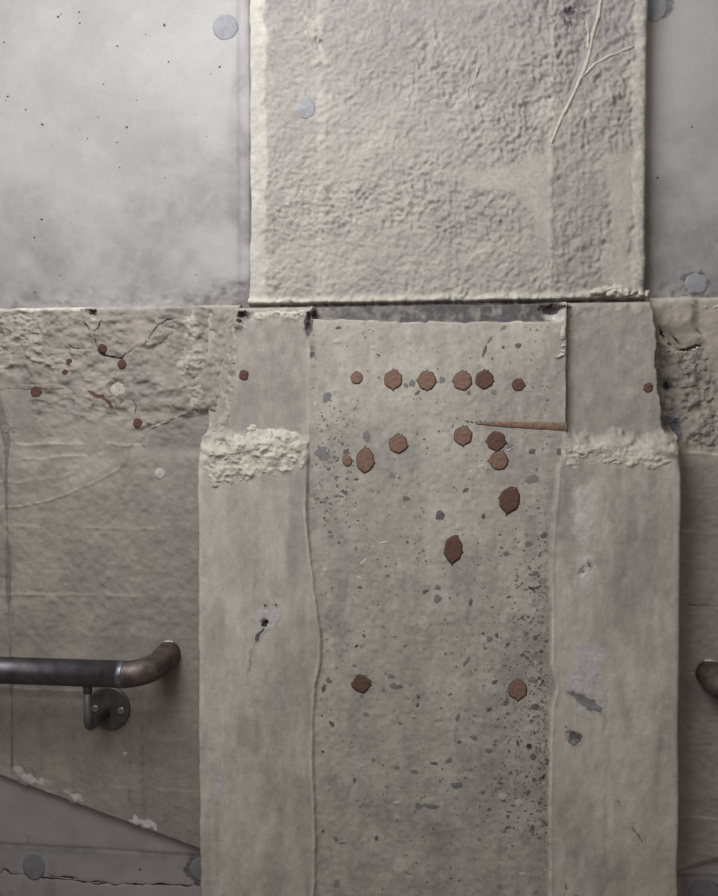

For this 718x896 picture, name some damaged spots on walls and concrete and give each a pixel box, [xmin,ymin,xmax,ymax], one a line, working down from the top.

spalling [589,283,649,301]
crack [68,317,179,359]
spalling [234,308,318,339]
corrosion [452,368,495,391]
spalling [438,303,671,489]
spalling [657,335,718,447]
spalling [202,388,384,553]
corrosion [485,431,509,470]
spalling [253,600,281,640]
spalling [356,495,549,859]
leakage [122,721,158,832]
crack [0,868,191,887]